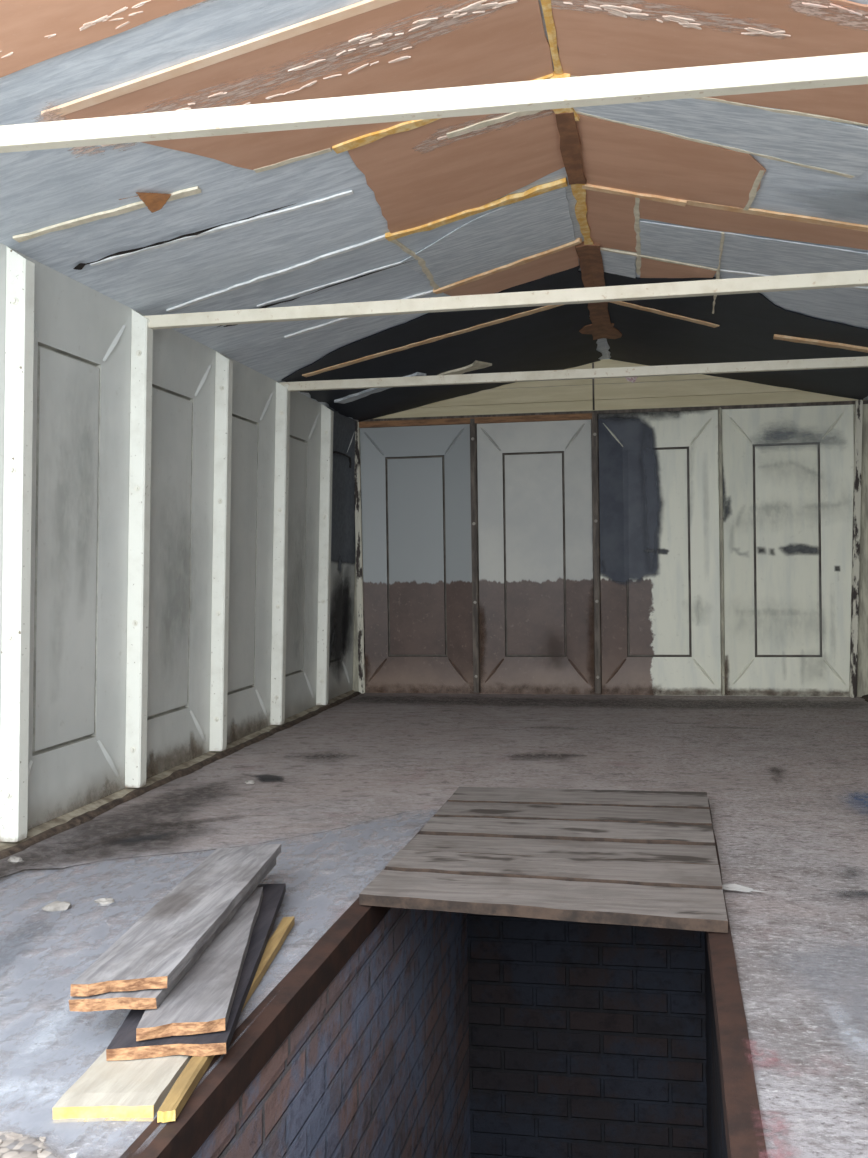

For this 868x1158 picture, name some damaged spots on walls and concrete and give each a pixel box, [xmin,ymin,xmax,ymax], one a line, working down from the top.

peeling [80,0,151,31]
peeling [131,0,518,115]
peeling [37,106,65,123]
peeling [414,109,553,152]